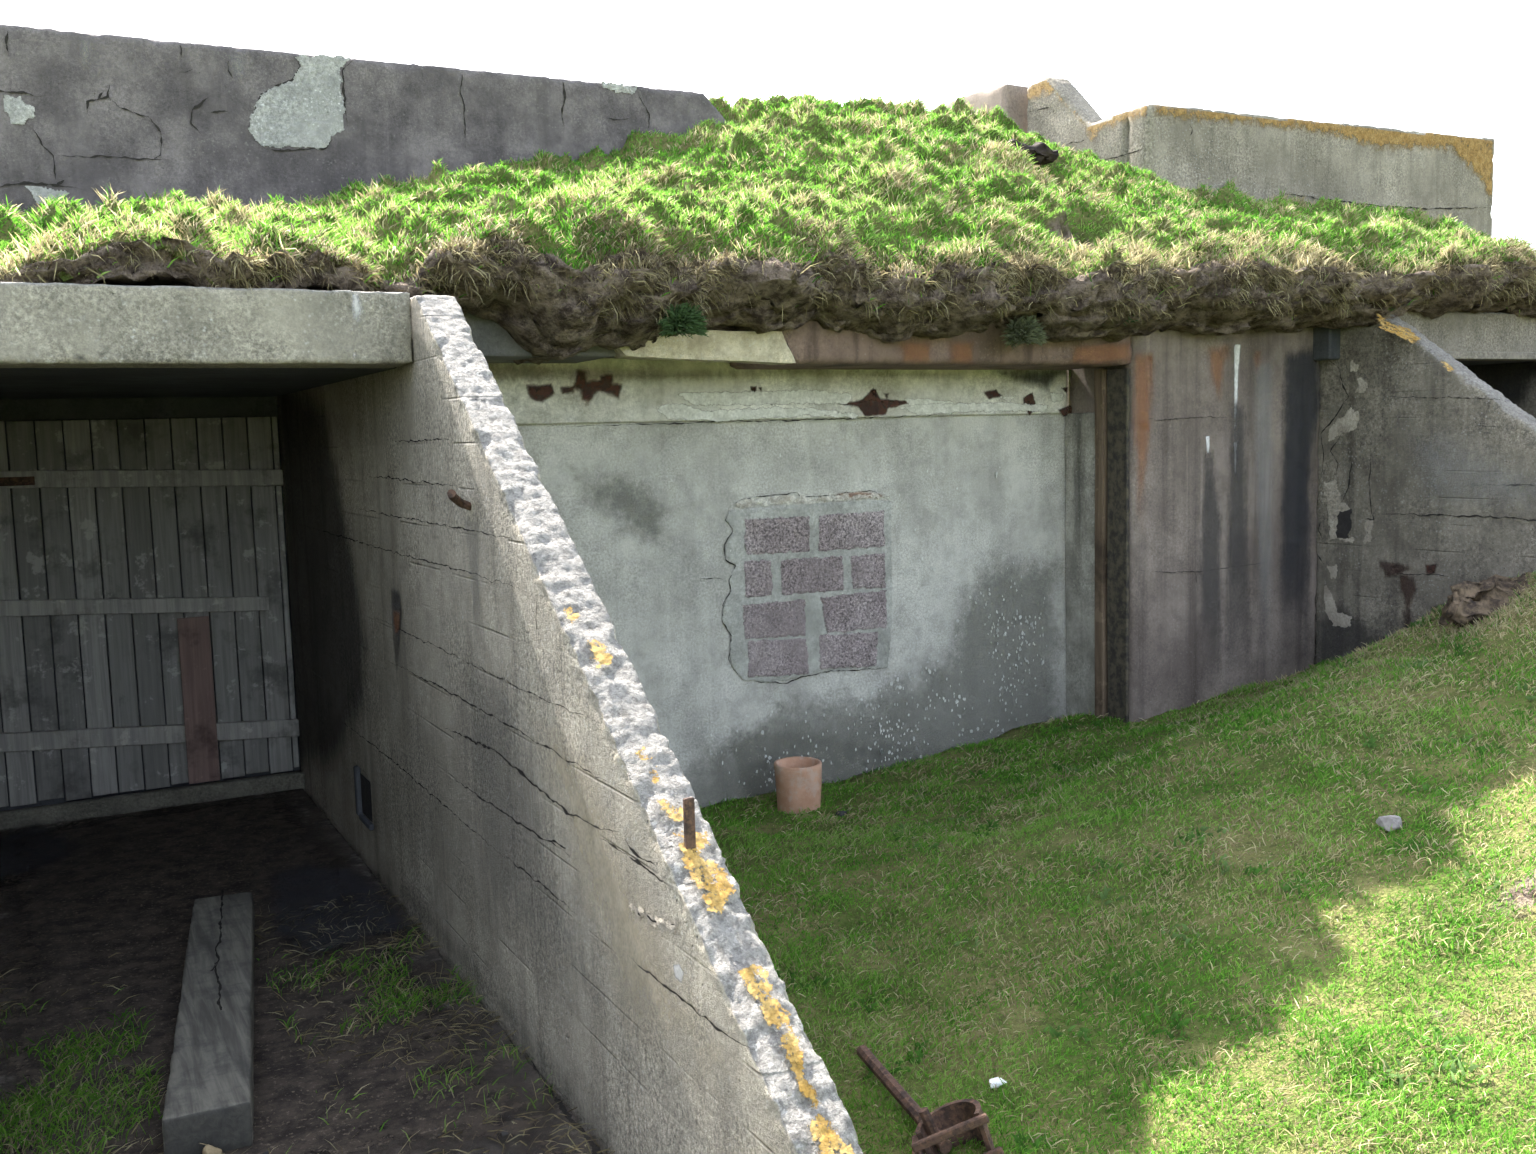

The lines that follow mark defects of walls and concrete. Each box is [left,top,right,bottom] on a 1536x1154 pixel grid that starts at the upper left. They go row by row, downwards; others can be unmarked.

spalling [3,95,35,125]
crack [0,32,355,188]
spalling [248,54,352,150]
rust [527,370,622,402]
rust [730,320,1132,416]
spalling [1328,360,1368,441]
water stain [1202,344,1246,620]
water stain [1282,351,1320,599]
spalling [1324,479,1373,544]
crack [344,620,675,925]
crack [210,889,224,1010]
crack [635,962,753,1050]